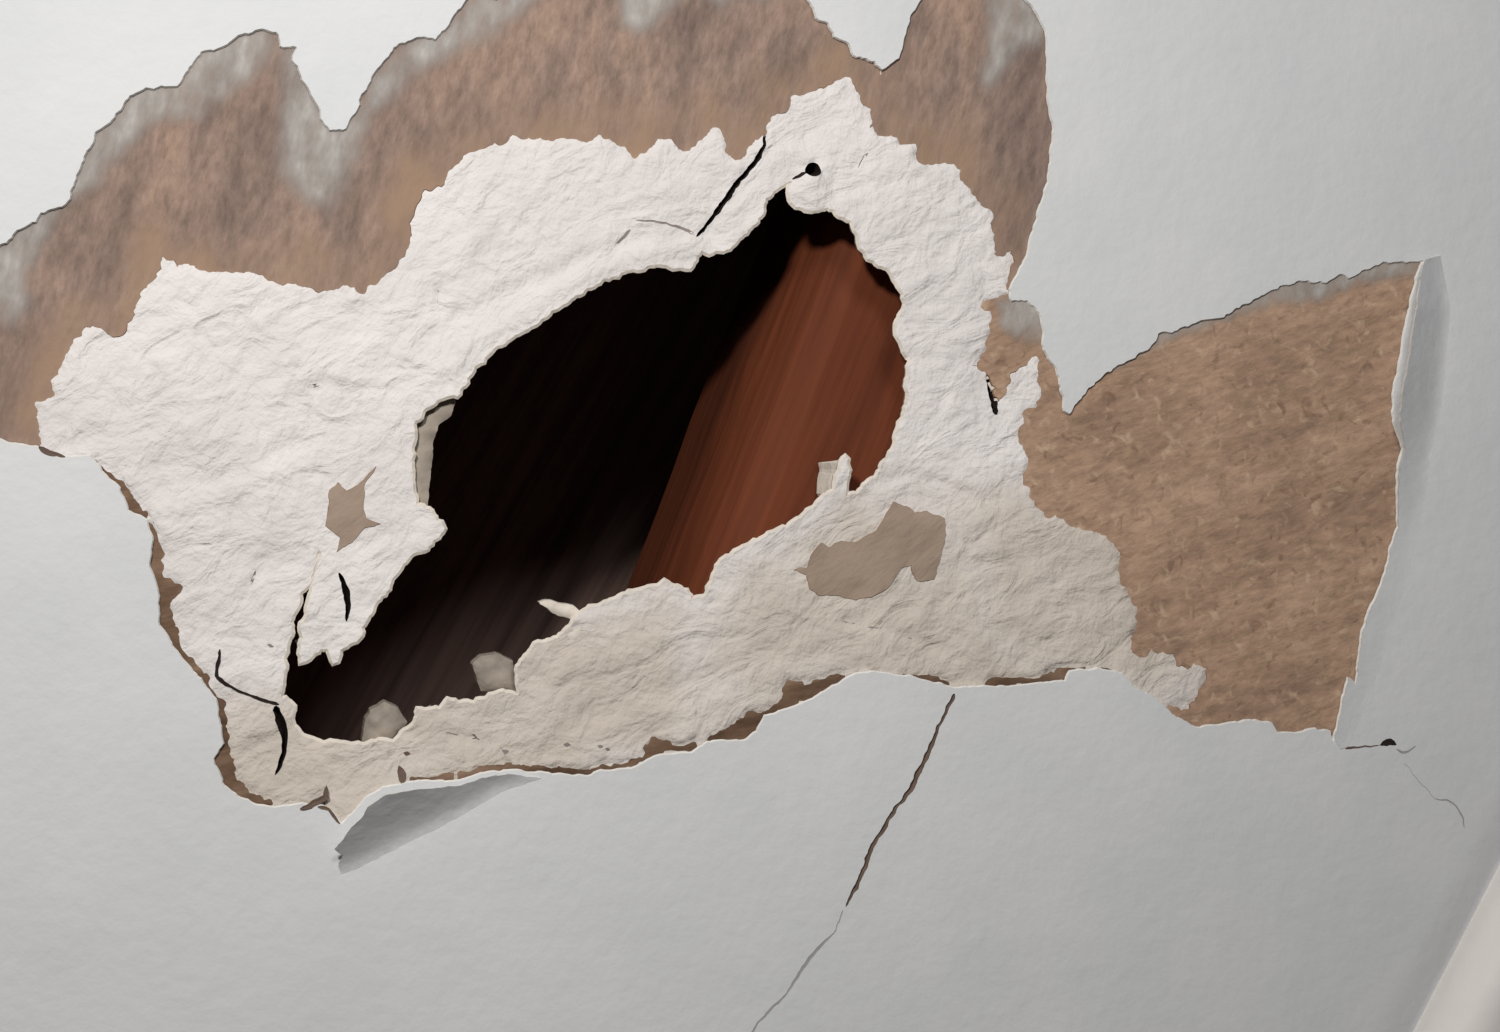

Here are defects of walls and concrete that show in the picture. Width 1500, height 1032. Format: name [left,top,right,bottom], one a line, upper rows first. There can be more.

crack [617,137,766,244]
flaking render [35,77,1207,822]
crack [338,573,351,621]
crack [215,649,288,775]
crack [300,786,340,824]
crack [1345,738,1465,828]
crack [752,694,955,1032]